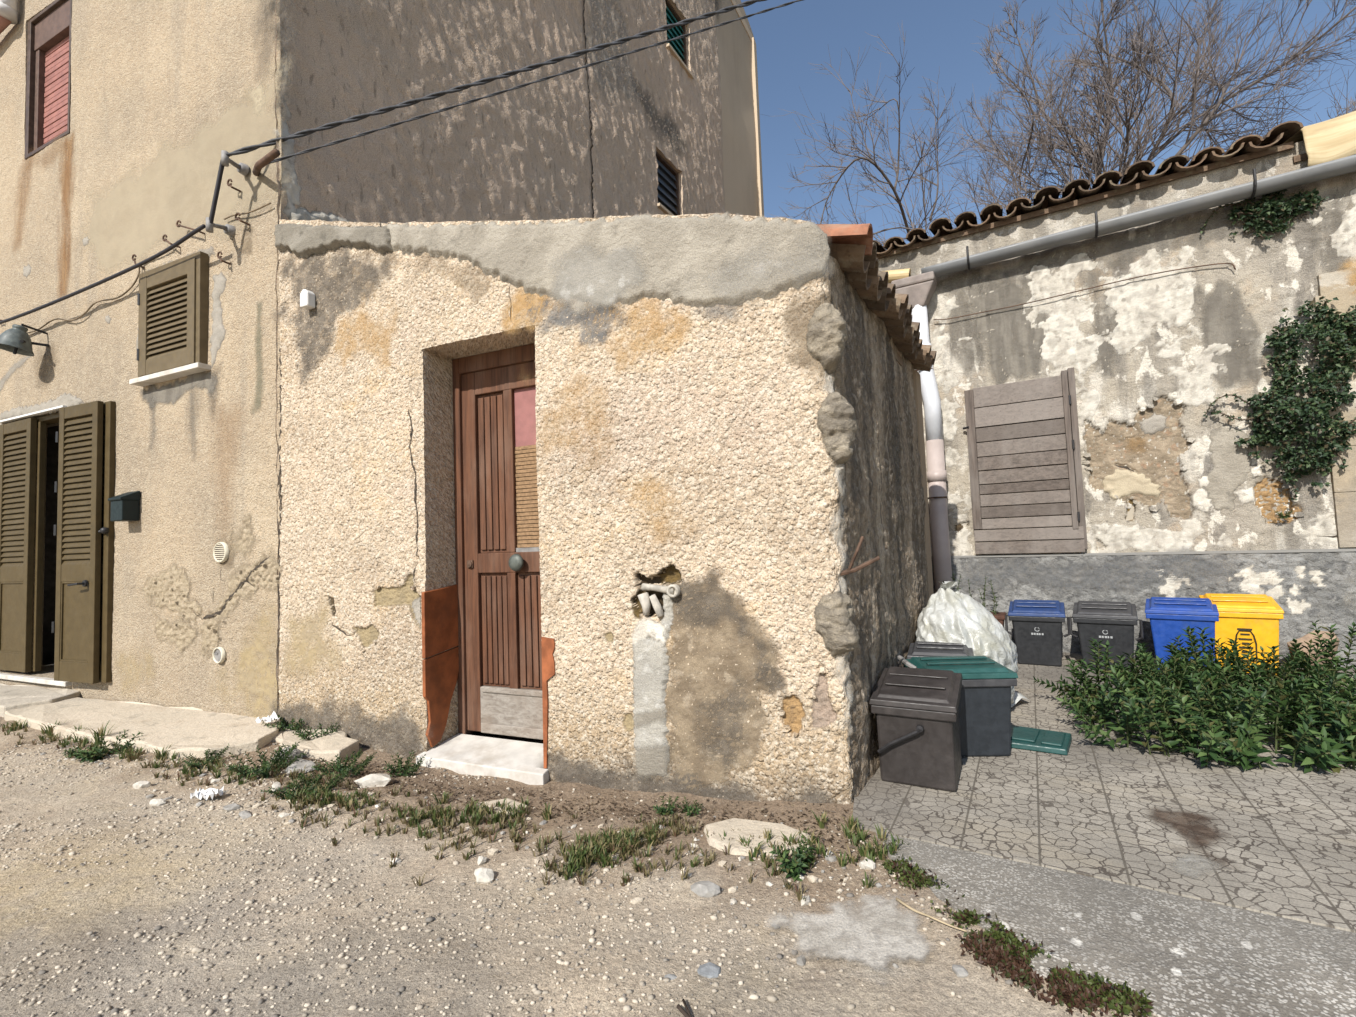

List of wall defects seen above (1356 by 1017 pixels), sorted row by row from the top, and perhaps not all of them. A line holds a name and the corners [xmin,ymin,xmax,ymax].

crack [583,0,594,218]
corrosion [60,140,72,294]
peeling [1310,188,1356,257]
damp [280,249,388,370]
peeling [1023,242,1234,553]
crack [193,349,281,620]
spalling [1235,465,1348,549]
spalling [142,515,281,656]
spalling [353,625,380,652]
spalling [373,574,421,628]
spalling [632,565,682,638]
damp [542,574,783,801]